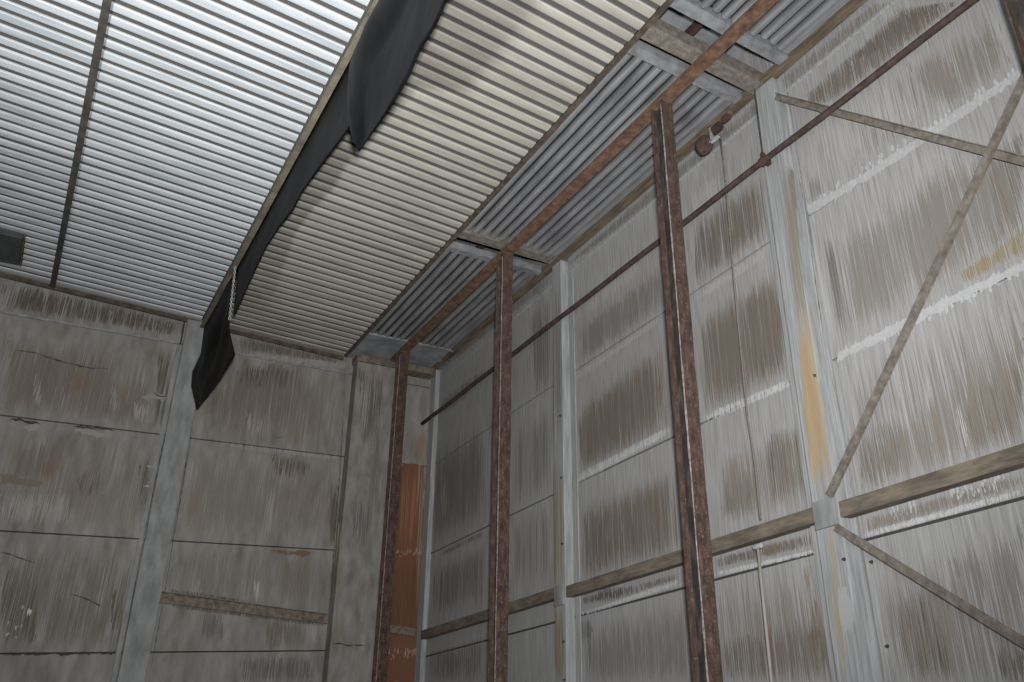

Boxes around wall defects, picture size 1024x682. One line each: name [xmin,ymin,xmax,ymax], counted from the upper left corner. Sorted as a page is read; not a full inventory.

damp [779,0,1024,489]
crack [16,350,108,369]
damp [568,104,790,682]
corrosion [795,299,832,488]
corrosion [387,463,425,682]